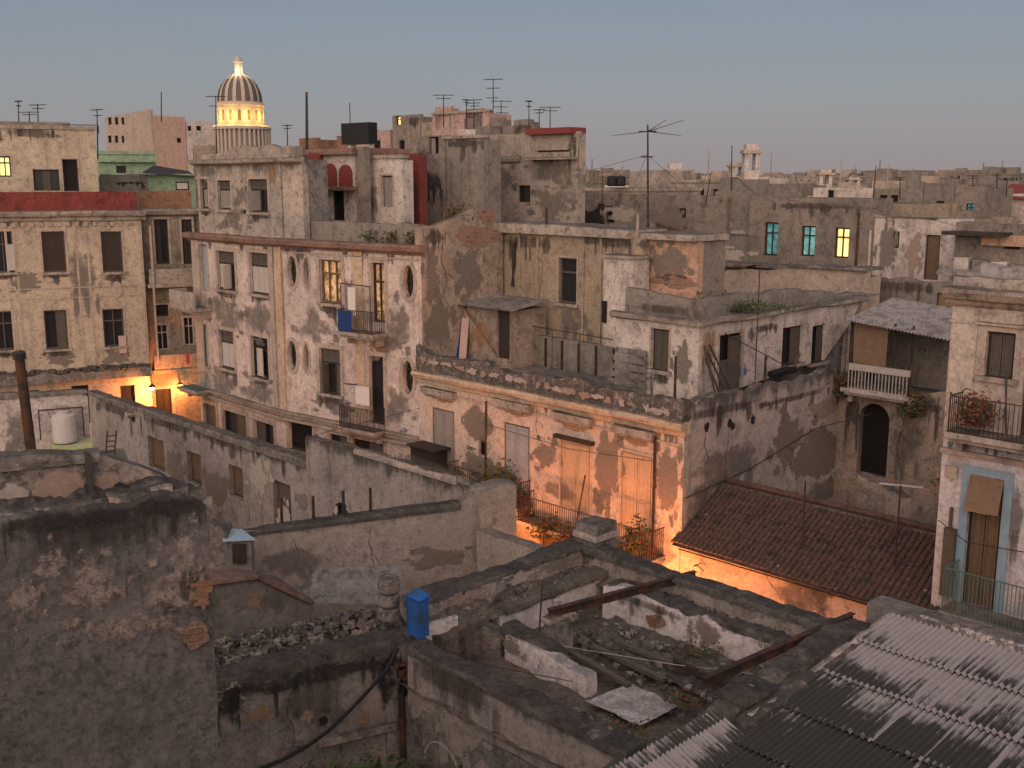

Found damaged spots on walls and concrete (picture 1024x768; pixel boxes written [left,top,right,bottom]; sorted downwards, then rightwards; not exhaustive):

peeling [371,208,670,416]
peeling [649,241,700,290]
peeling [670,340,693,385]
damp [2,497,202,559]
peeling [0,465,230,650]
peeling [527,435,563,471]
peeling [592,423,626,518]
peeling [651,434,685,528]